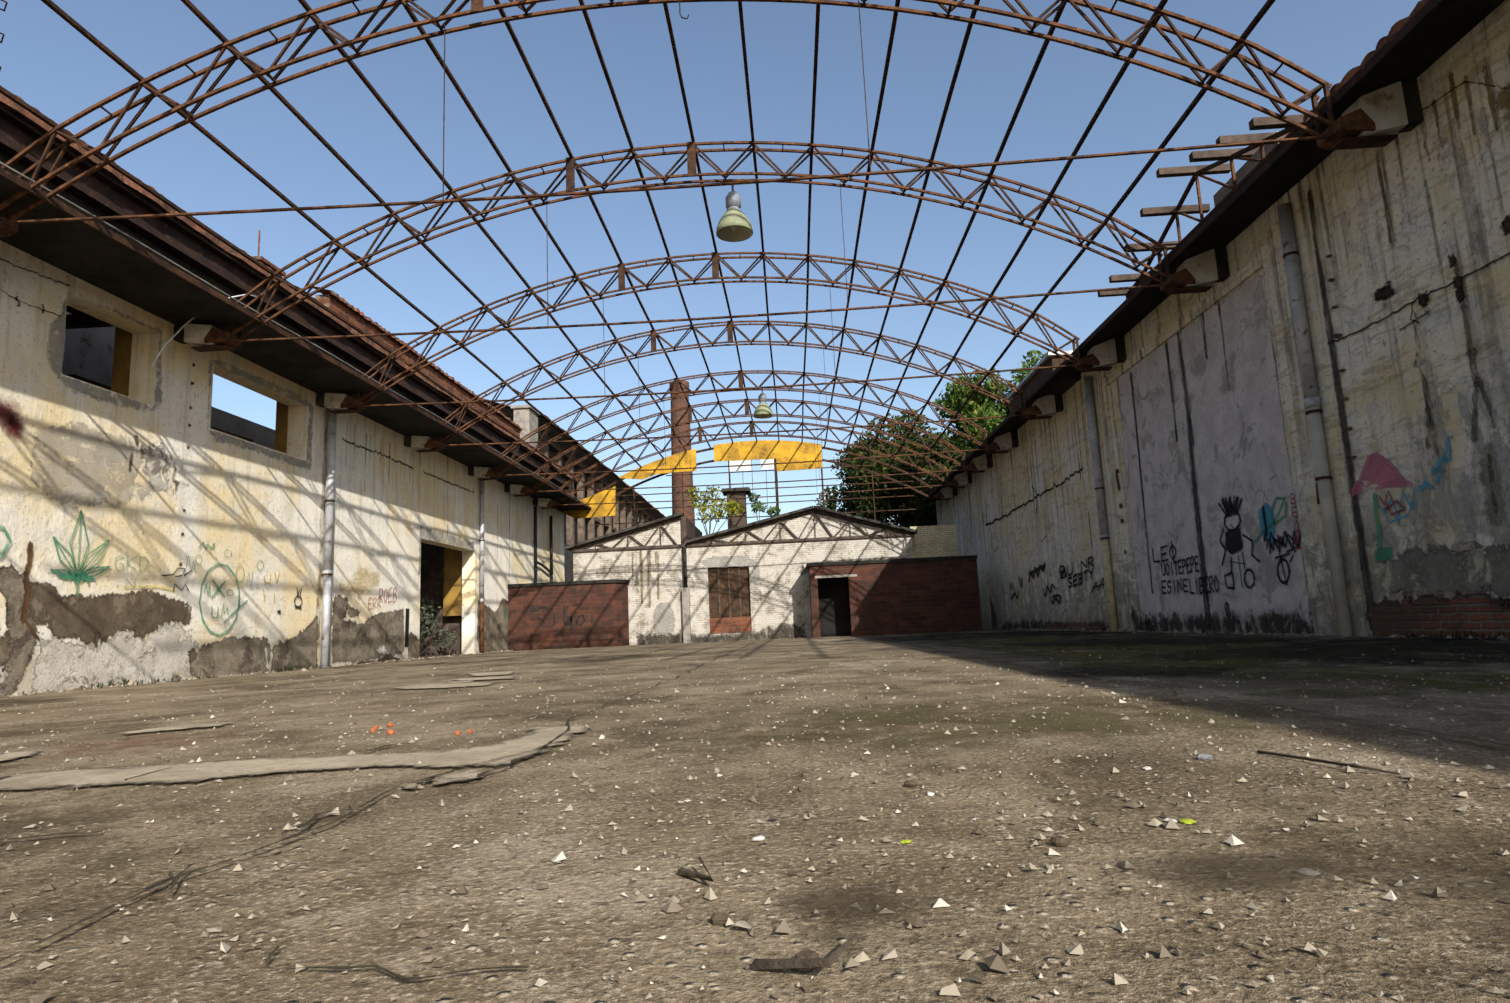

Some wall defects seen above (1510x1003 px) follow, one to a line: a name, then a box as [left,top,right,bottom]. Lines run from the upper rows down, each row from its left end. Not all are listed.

water stain [1376,154,1394,243]
spalling [1499,212,1510,236]
spalling [1374,280,1395,306]
crack [1327,252,1510,344]
spalling [1417,290,1430,311]
spalling [1448,253,1468,308]
peeling [31,422,189,509]
water stain [873,190,1510,677]
peeling [0,564,420,696]
flaking render [1364,590,1510,638]
crack [0,642,754,961]
crack [264,946,530,980]